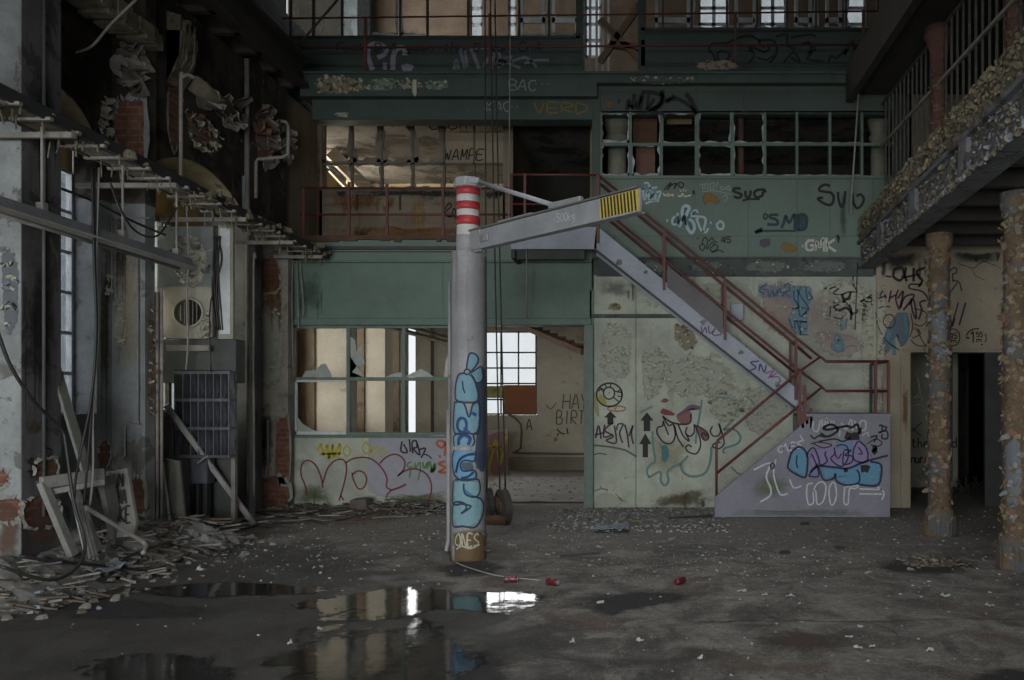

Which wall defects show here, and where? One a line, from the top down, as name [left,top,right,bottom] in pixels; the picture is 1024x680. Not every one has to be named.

spalling [98,41,156,158]
peeling [166,82,298,172]
peeling [0,247,19,335]
peeling [642,320,789,435]
peeling [922,246,953,511]
peeling [996,204,1024,538]
spalling [0,455,61,531]
spalling [261,413,293,510]